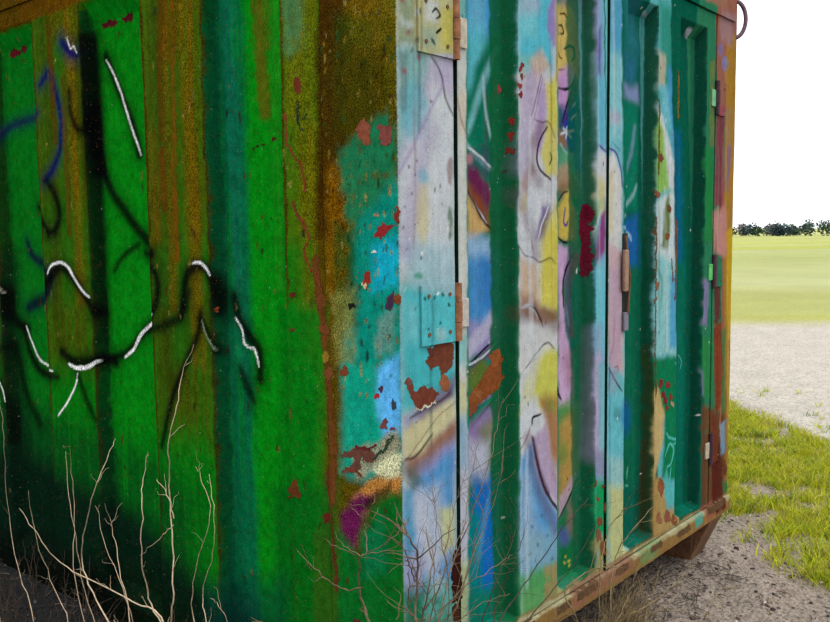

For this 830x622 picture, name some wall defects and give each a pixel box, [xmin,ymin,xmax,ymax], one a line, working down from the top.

peeling [405,342,454,412]
peeling [340,418,395,477]
corrosion [591,479,607,555]
corrosion [656,510,691,537]
corrosion [451,547,463,622]
corrosion [557,579,598,615]